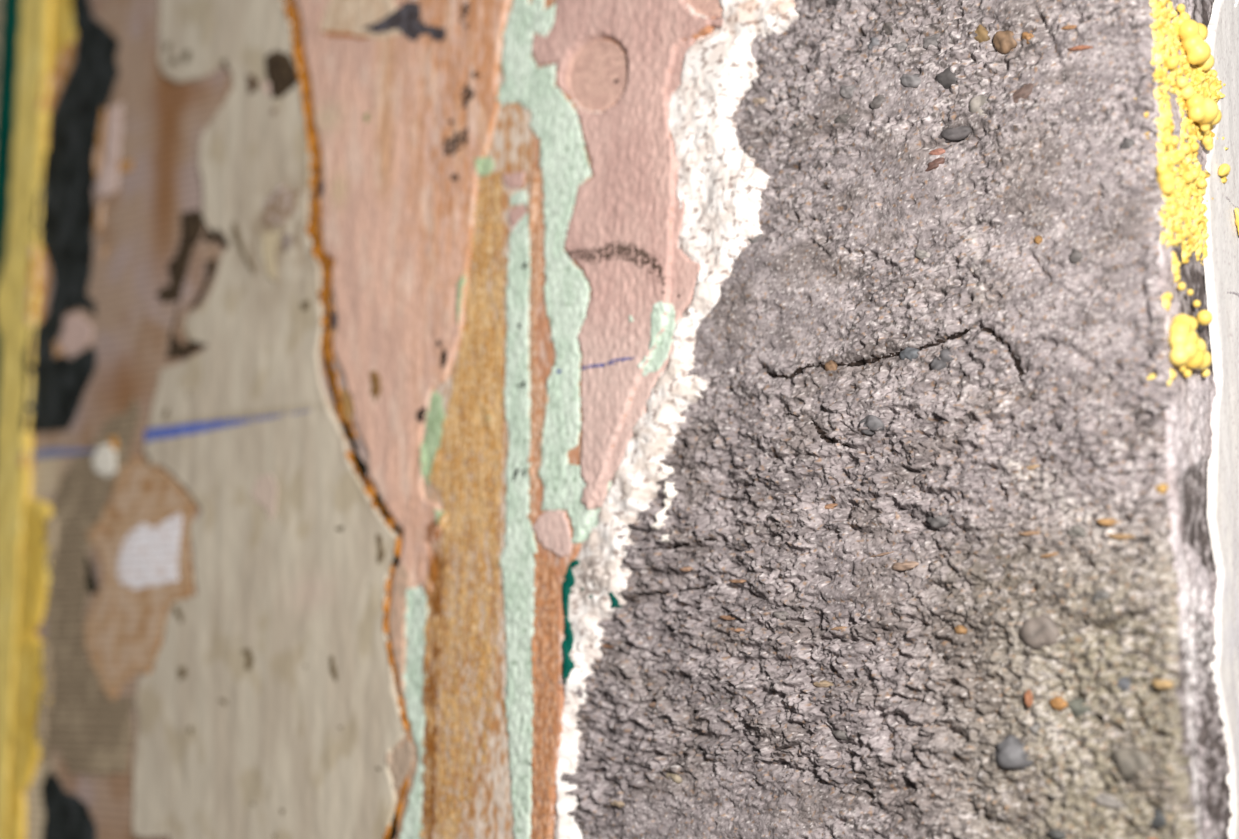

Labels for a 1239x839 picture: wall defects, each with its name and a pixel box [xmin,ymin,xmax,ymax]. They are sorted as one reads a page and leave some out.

peeling [97,103,123,226]
peeling [58,312,93,356]
crack [763,327,1026,379]
spalling [92,436,118,478]
peeling [132,0,407,839]
spalling [296,0,1233,839]
crack [784,410,849,447]
spalling [117,513,183,590]